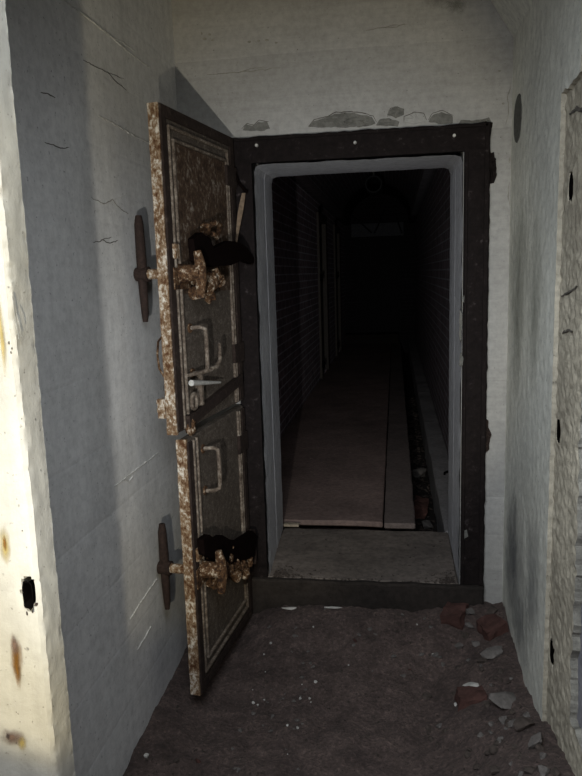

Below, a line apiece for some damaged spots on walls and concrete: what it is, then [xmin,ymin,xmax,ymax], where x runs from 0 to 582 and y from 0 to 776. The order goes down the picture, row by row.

flaking render [308,107,493,129]
corrosion [6,733,24,747]